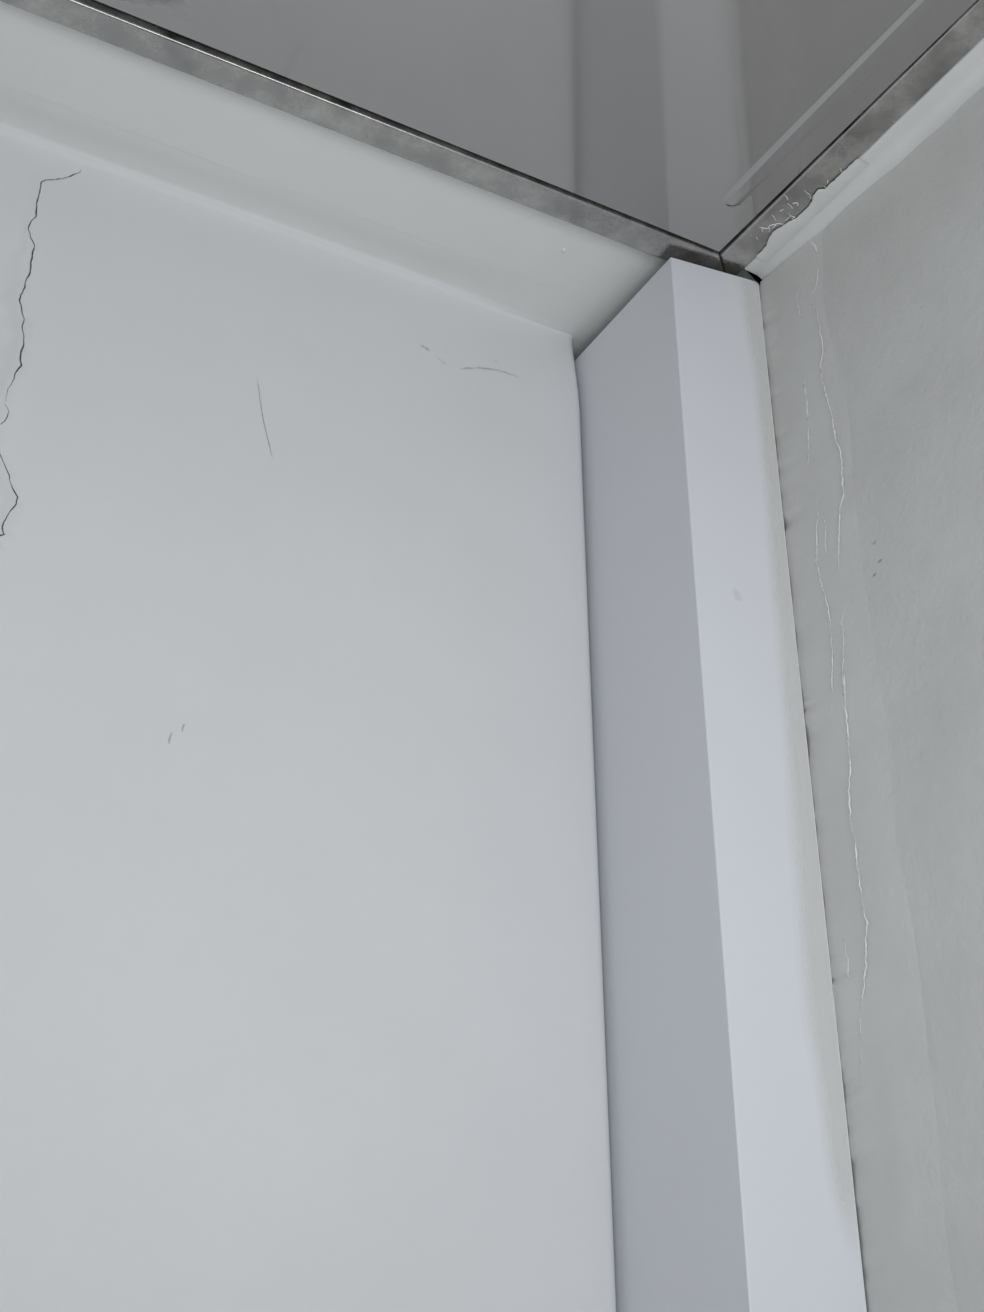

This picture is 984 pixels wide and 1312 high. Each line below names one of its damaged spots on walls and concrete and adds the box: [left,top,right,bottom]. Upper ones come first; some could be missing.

crack [1,172,79,424]
crack [0,455,18,536]